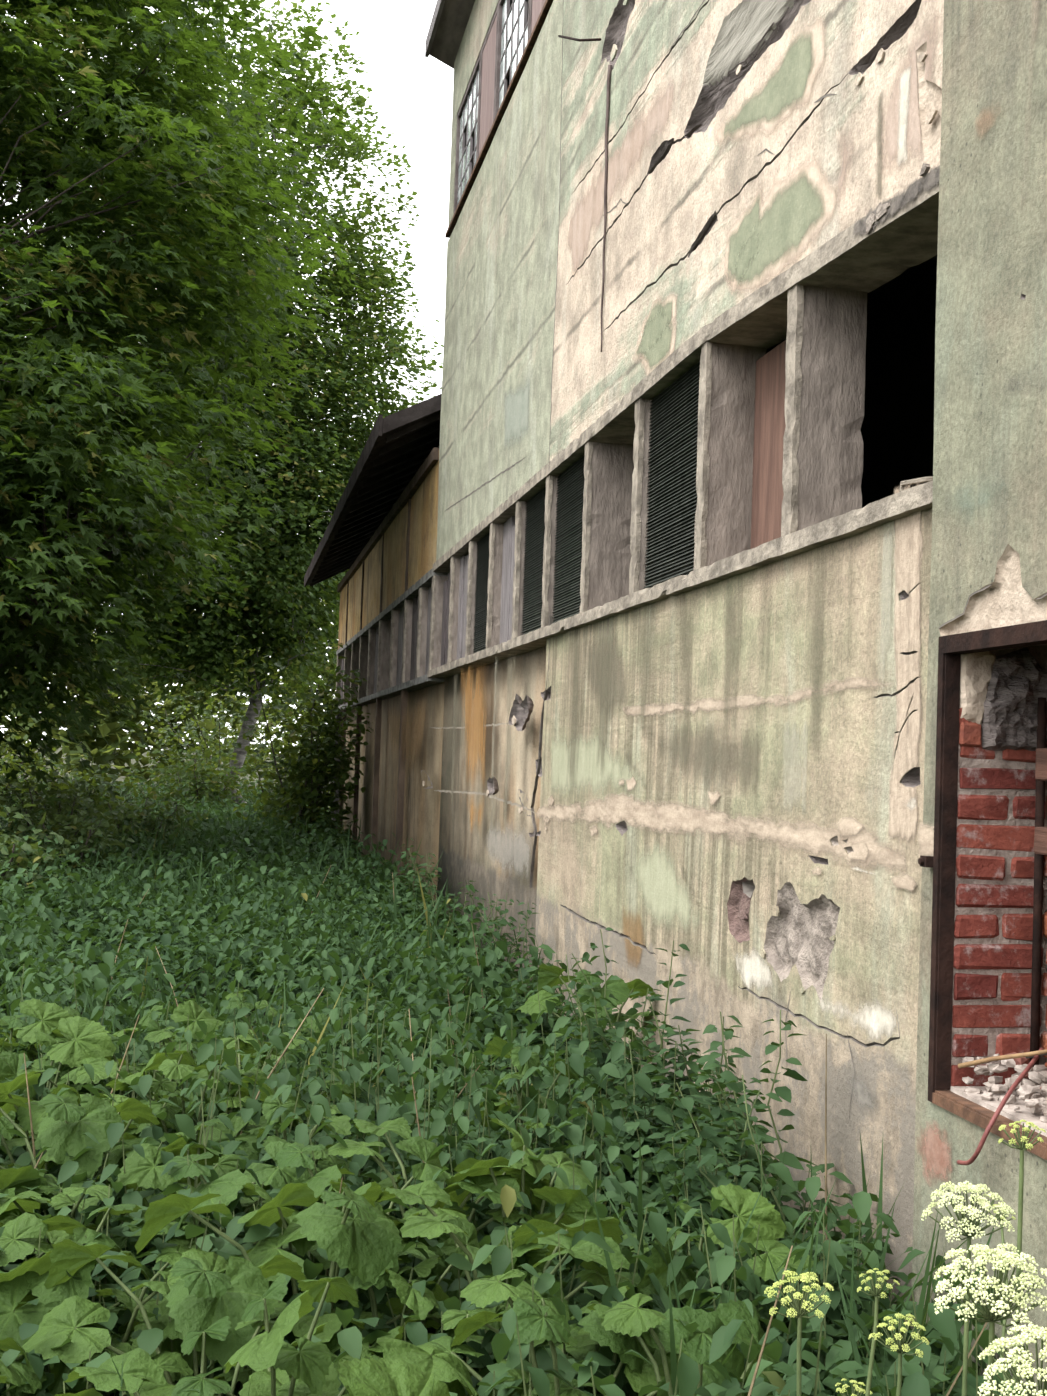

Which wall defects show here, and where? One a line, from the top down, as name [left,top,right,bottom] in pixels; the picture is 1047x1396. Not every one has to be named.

spalling [684,0,825,143]
peeling [848,0,942,236]
crack [605,73,848,330]
flaking render [938,544,1047,636]
crack [429,615,552,888]
leakage [552,736,637,792]
leakage [588,645,624,709]
leakage [662,731,757,785]
peeling [518,511,934,891]
crack [874,651,920,754]
spalling [727,877,840,1002]
crack [738,986,900,1119]